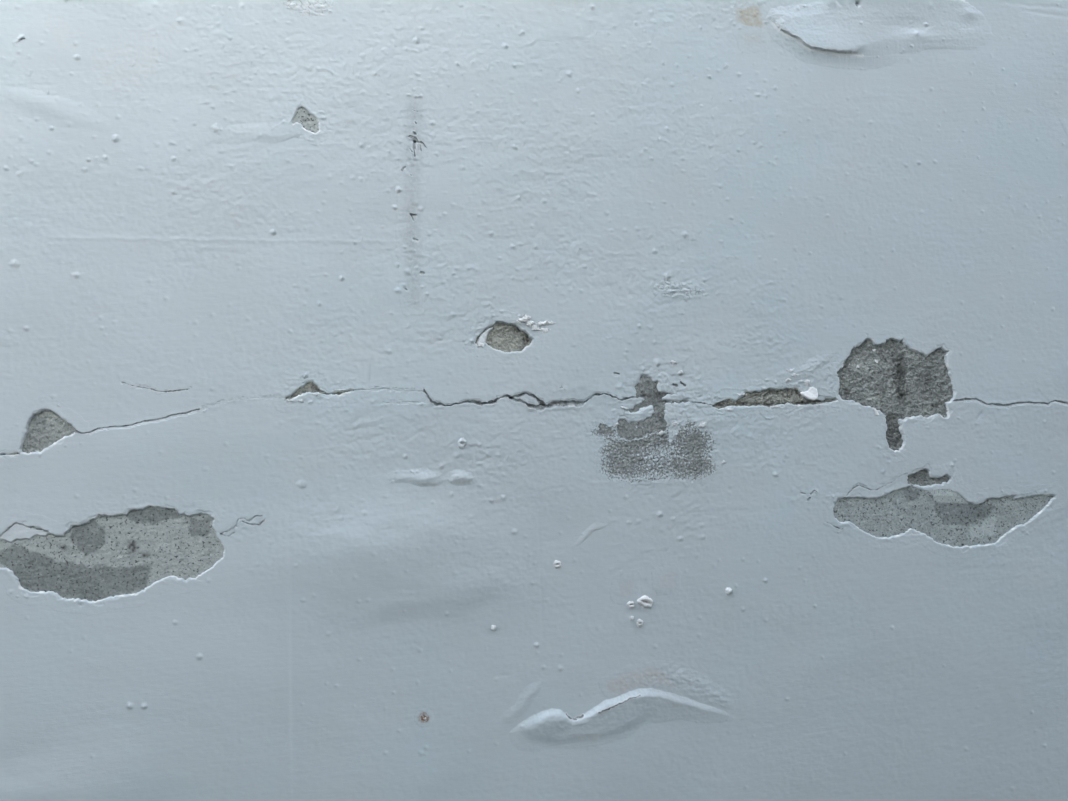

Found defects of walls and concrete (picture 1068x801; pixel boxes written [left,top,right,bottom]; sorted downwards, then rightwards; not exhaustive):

peeling [278,93,332,146]
spalling [462,309,556,365]
crack [0,439,30,470]
peeling [4,396,90,467]
crack [74,379,202,435]
crack [352,369,643,414]
crack [671,379,719,411]
peeling [583,325,1066,559]
crack [951,395,1068,410]
peeling [0,493,229,616]